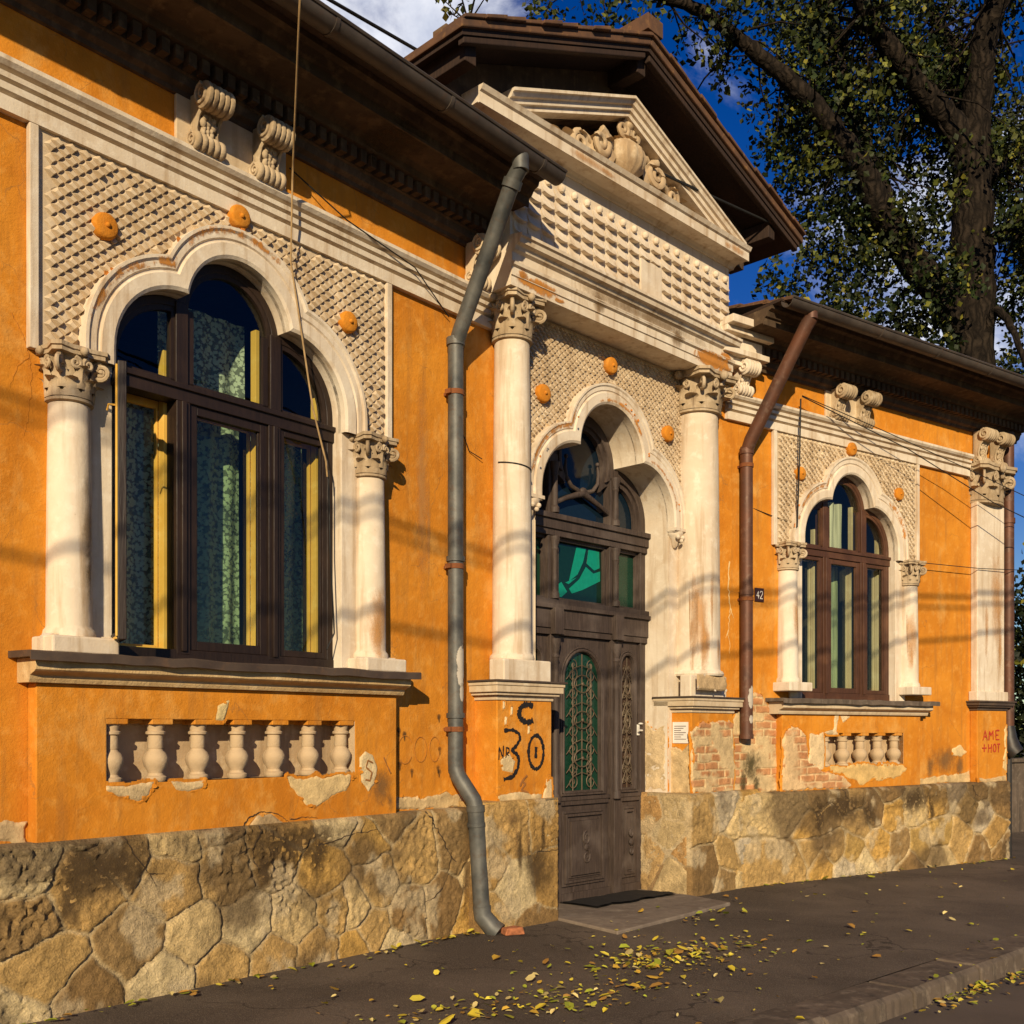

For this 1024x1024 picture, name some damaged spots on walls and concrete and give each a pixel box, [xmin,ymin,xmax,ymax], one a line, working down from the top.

flaking render [106,777,208,804]
flaking render [284,751,378,810]
flaking render [499,754,516,775]
flaking render [645,691,908,793]
flaking render [0,820,28,844]
crack [240,811,315,872]